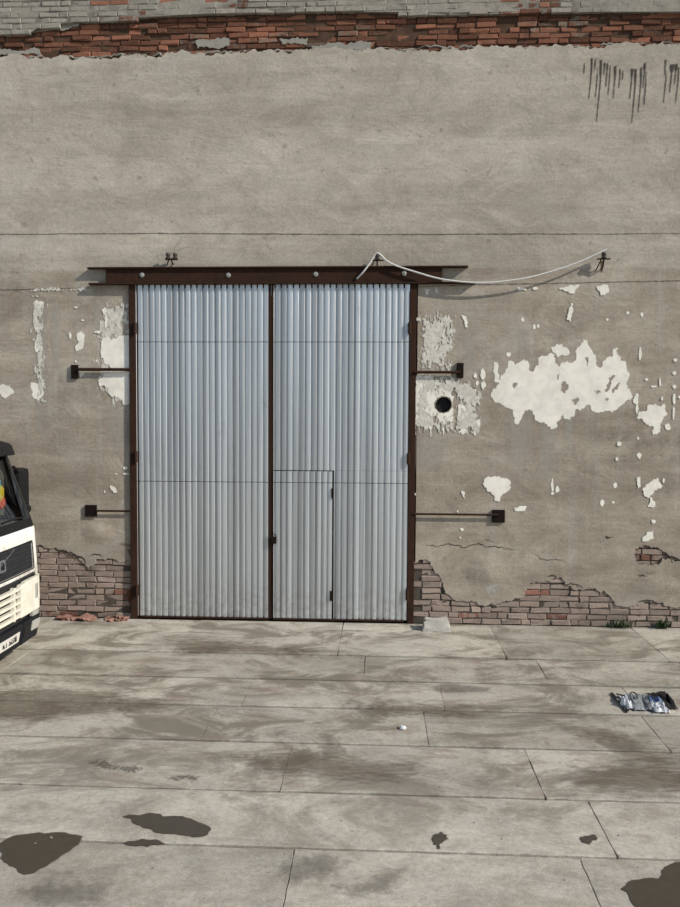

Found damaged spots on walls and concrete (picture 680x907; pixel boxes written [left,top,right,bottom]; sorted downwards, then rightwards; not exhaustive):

flaking render [0,13,680,60]
damp [583,58,647,121]
damp [663,60,680,102]
peeling [0,384,15,399]
peeling [22,287,93,403]
peeling [69,300,129,410]
peeling [415,310,680,437]
peeling [483,476,511,502]
peeling [637,477,665,508]
flaking render [634,519,680,565]
flaking render [36,544,140,619]
flaking render [406,540,680,628]